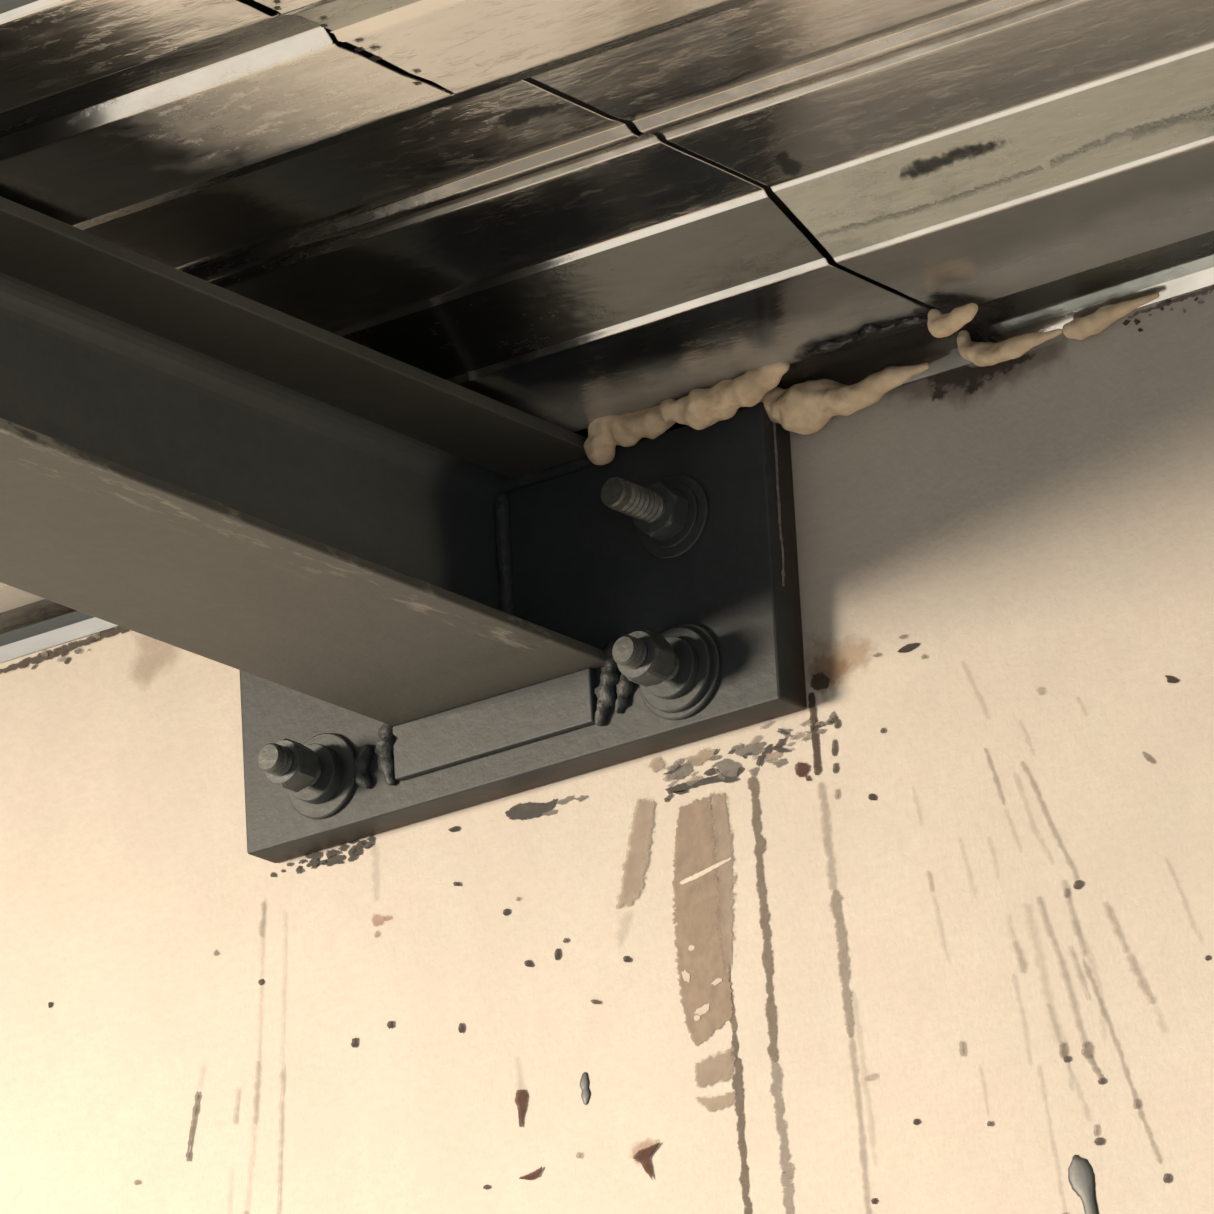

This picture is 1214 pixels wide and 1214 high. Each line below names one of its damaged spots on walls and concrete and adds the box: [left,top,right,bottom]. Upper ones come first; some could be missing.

corrosion [811,672,830,690]
peeling [648,711,838,802]
water stain [616,800,655,909]
water stain [1064,880,1084,898]
water stain [672,793,752,1214]
water stain [747,776,794,1214]
water stain [830,890,854,1038]
water stain [1060,1042,1105,1085]